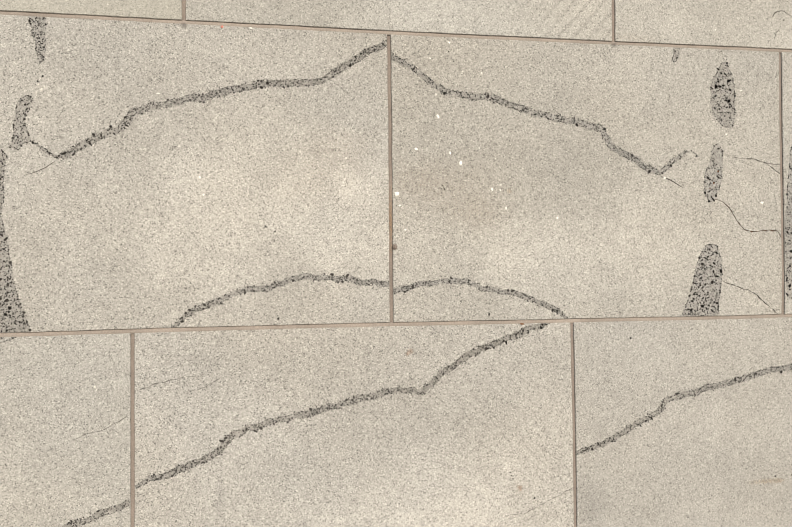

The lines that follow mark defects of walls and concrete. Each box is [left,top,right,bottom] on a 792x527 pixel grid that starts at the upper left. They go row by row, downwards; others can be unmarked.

spalling [28,16,47,85]
crack [27,40,698,188]
spalling [710,51,736,129]
spalling [0,95,34,332]
spalling [703,143,724,202]
spalling [680,244,723,317]
crack [62,272,568,527]
crack [577,363,792,455]